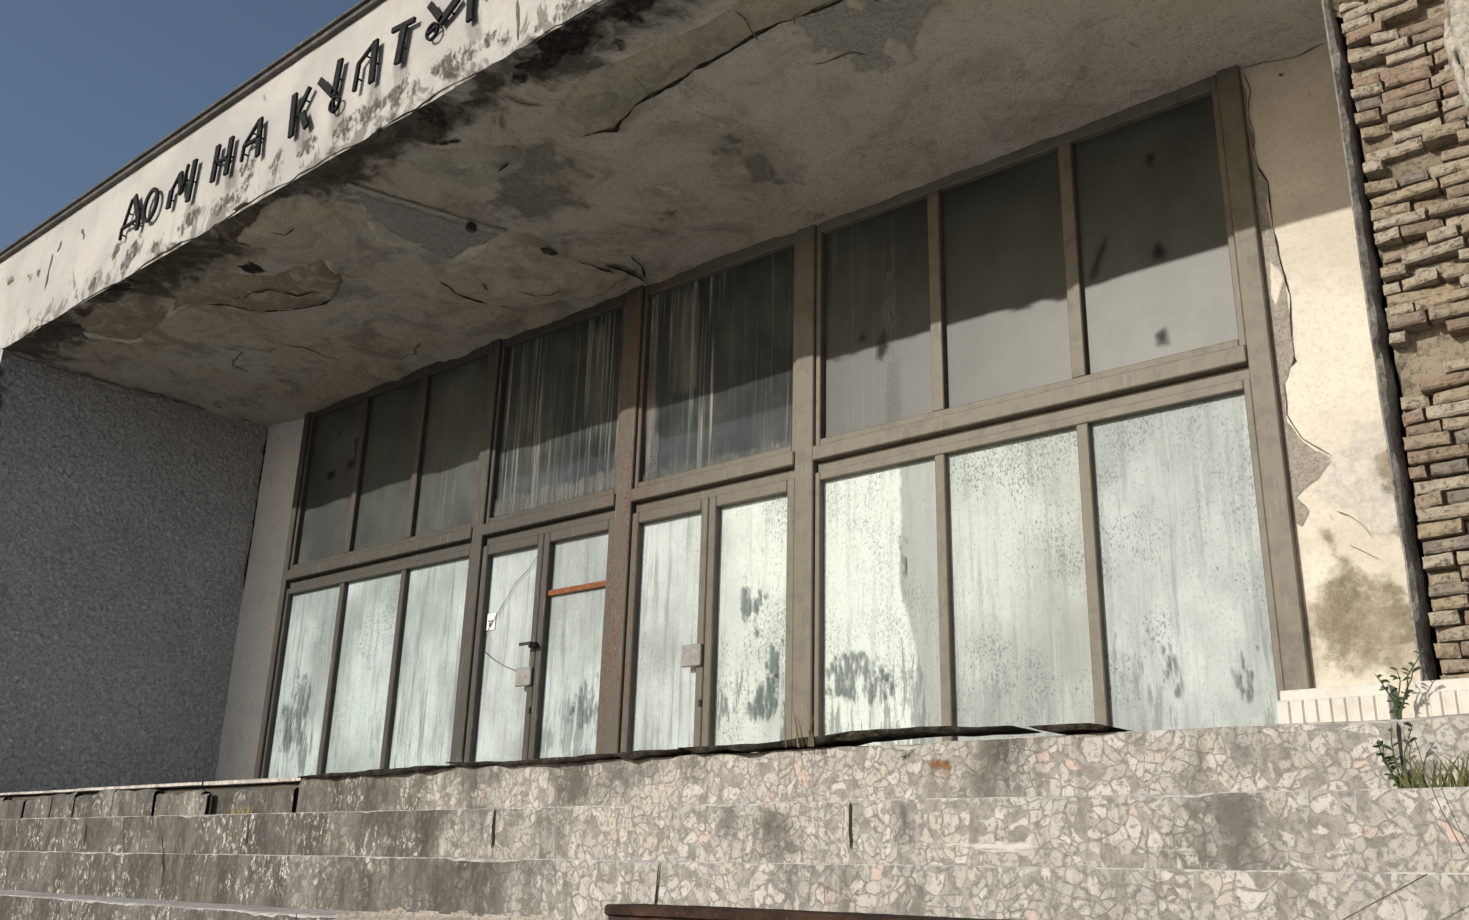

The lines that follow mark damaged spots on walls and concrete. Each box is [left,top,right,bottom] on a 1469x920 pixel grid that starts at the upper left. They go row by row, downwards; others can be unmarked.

leakage [228,0,654,195]
crack [575,0,878,139]
flaking render [357,192,497,259]
spalling [540,246,558,256]
flaking render [1242,85,1331,526]
flaking render [1331,0,1469,680]
leakage [1318,422,1400,536]
leakage [1307,558,1414,671]